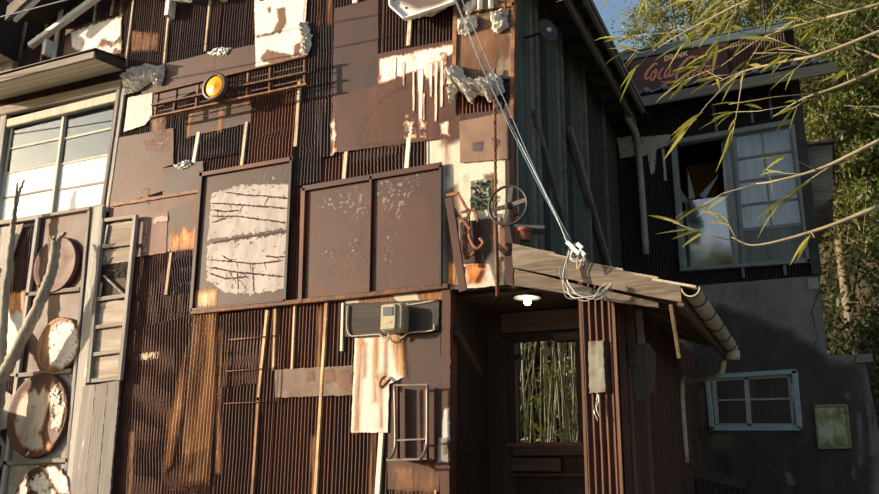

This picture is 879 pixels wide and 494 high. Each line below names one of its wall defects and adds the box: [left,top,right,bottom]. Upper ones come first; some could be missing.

peeling [377,44,453,86]
peeling [403,114,428,140]
rust [169,228,195,251]
peeling [206,169,288,297]
rust [445,186,484,286]
peeling [46,320,79,370]
rust [163,288,218,487]
rust [307,335,404,431]
peeling [13,380,66,453]
peeling [15,465,70,494]
rust [392,465,435,493]